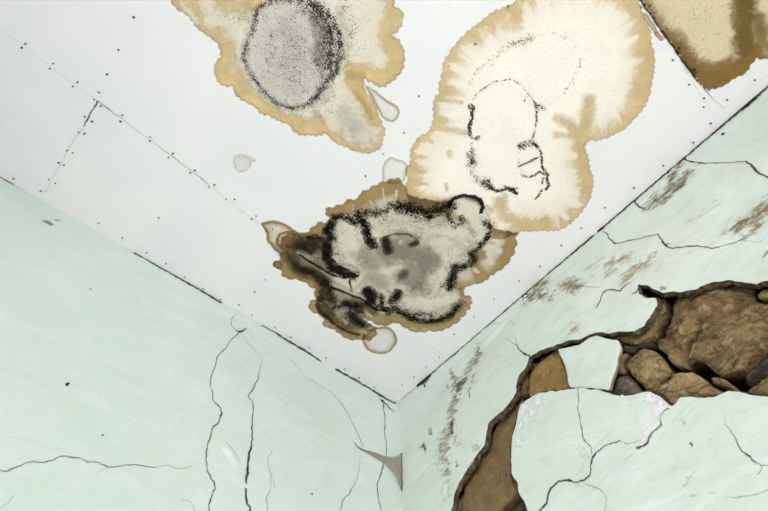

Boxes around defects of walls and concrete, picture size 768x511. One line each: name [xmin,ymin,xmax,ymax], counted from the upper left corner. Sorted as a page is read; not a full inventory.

water stain [171,0,405,154]
water stain [261,0,768,354]
corrosion [643,161,693,210]
crack [602,231,747,249]
crack [684,157,768,178]
corrosion [731,201,768,237]
crack [0,456,154,472]
crack [205,317,247,511]
crack [245,375,259,511]
crack [377,399,395,511]
flaking render [451,280,768,511]